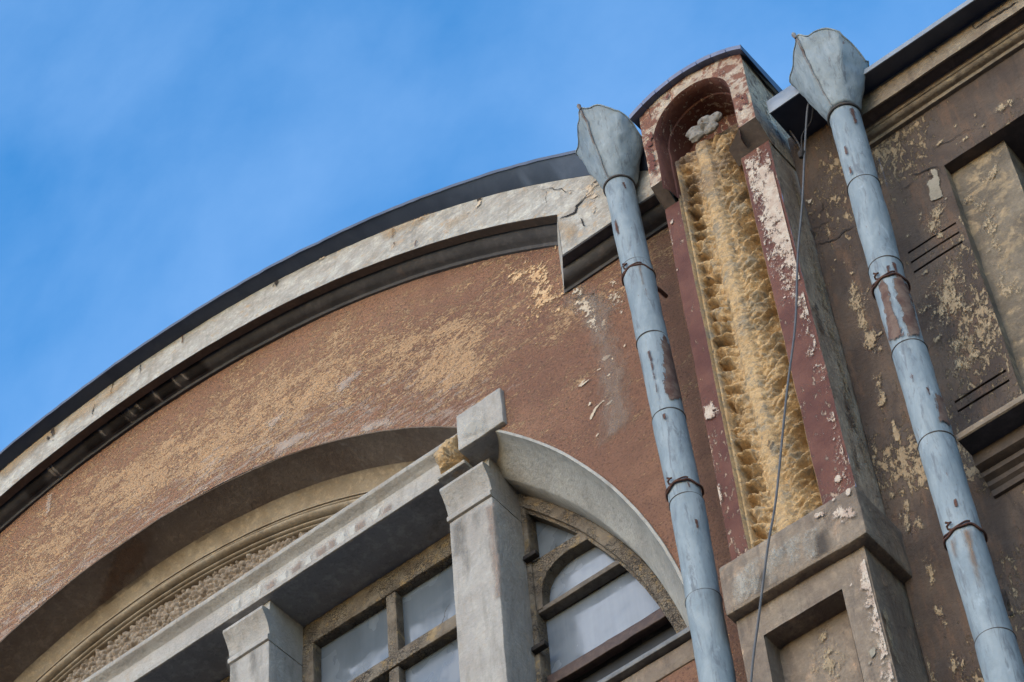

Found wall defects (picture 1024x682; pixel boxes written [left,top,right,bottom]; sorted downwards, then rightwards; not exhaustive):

crack [544,181,596,226]
spalling [919,169,947,238]
peeling [497,246,607,331]
peeling [744,148,825,381]
peeling [849,271,882,350]
peeling [918,259,990,384]
peeling [964,197,1021,298]
peeling [889,492,924,531]
peeling [850,559,894,682]